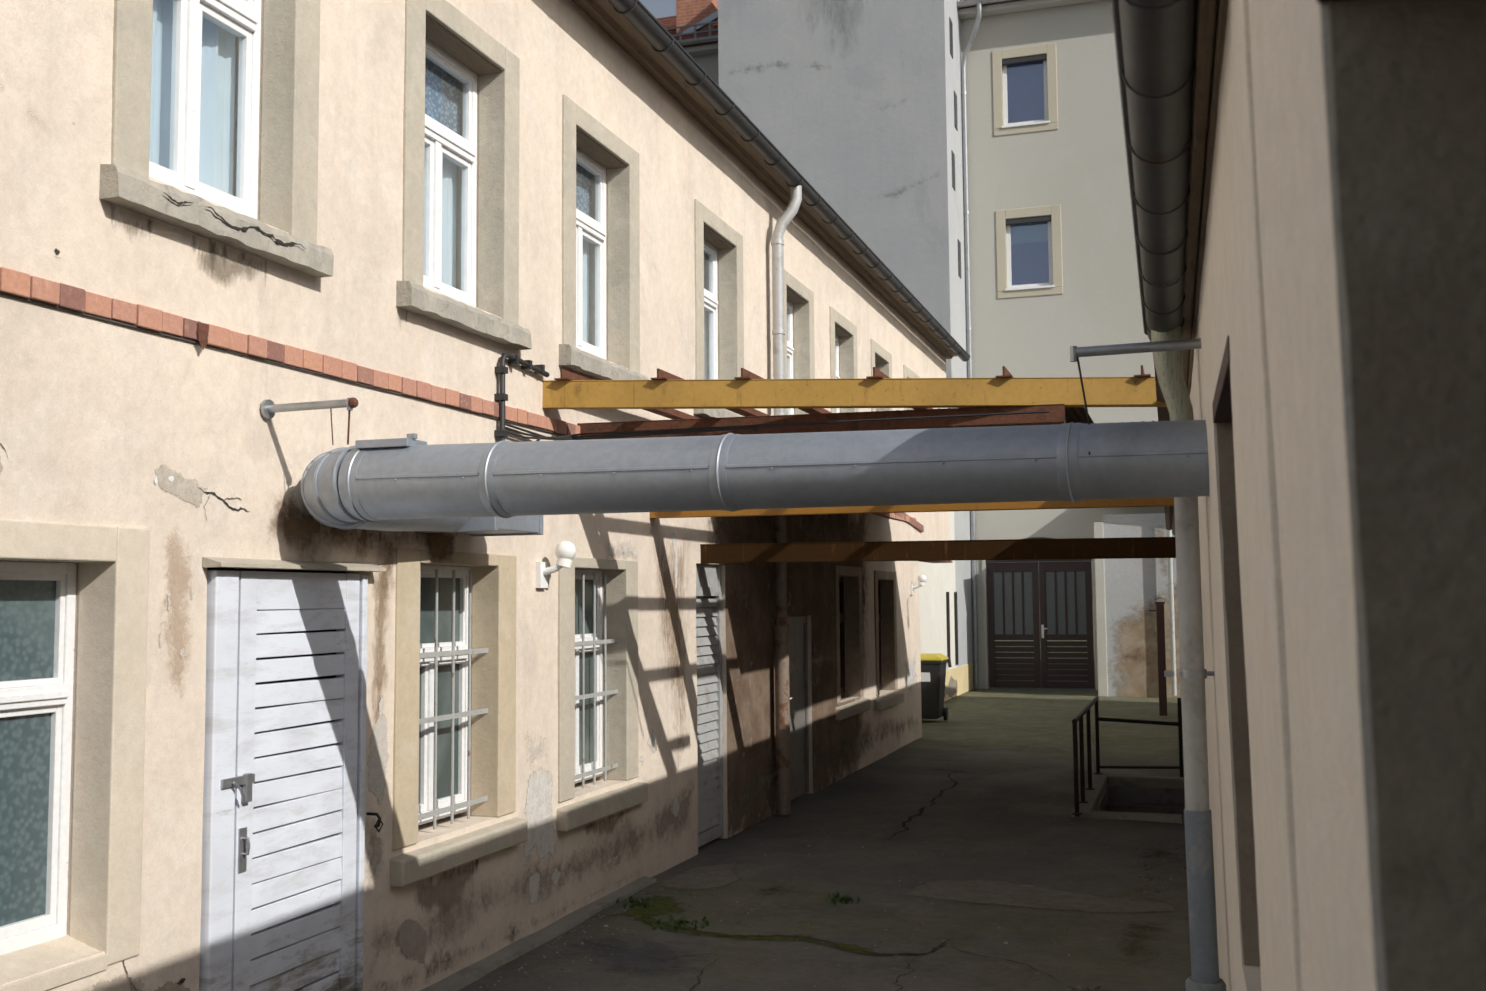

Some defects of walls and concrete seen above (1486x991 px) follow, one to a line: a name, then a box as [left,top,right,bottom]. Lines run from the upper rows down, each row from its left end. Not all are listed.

crack [163,192,306,249]
crack [198,487,250,519]
crack [631,915,1060,991]
spalling [155,978,190,991]